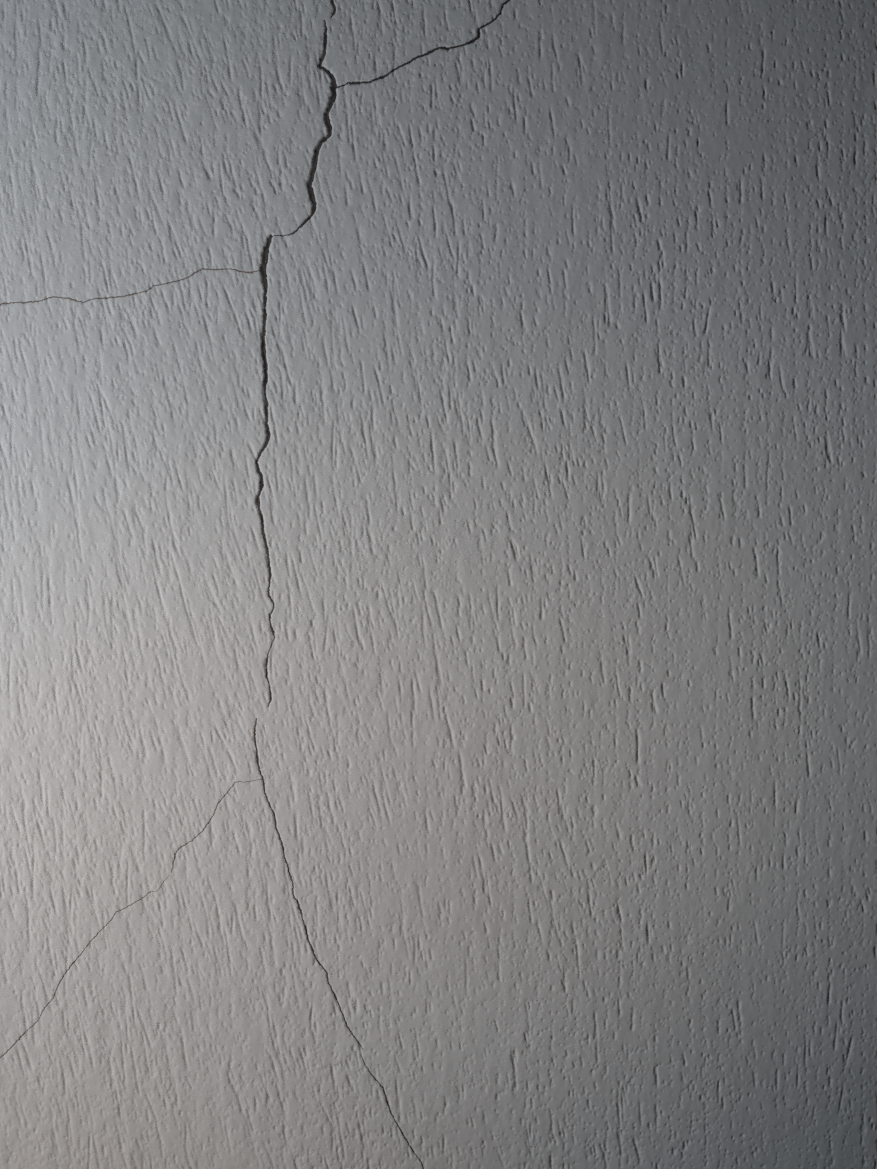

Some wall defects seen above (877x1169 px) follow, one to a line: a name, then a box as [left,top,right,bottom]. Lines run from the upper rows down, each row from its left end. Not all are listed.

crack [0,0,510,1169]